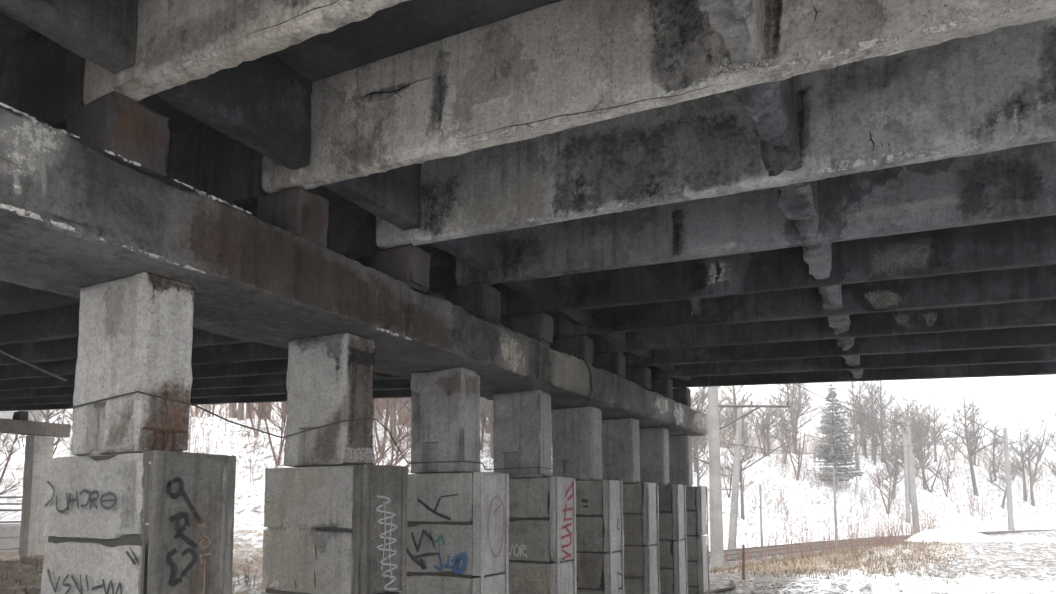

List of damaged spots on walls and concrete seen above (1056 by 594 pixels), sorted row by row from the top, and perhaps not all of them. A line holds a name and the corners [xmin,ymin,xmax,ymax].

crack [235,0,339,41]
leakage [649,0,714,91]
crack [352,77,431,102]
leakage [429,76,448,127]
crack [458,85,712,139]
spalling [460,36,899,145]
leakage [552,113,760,218]
rust [139,384,191,451]